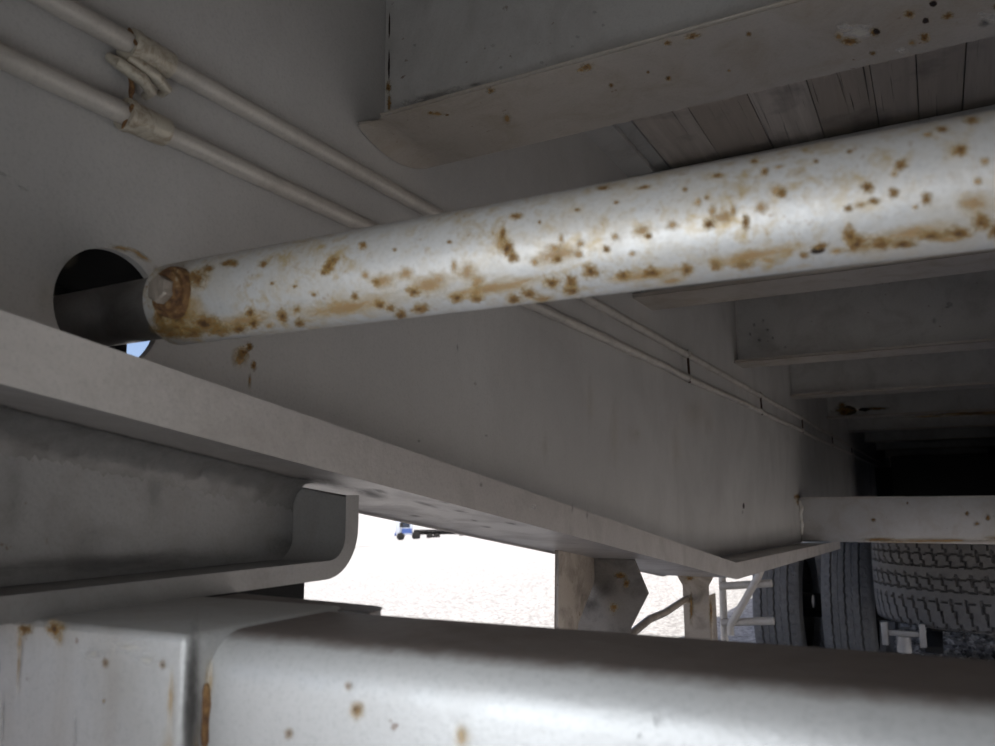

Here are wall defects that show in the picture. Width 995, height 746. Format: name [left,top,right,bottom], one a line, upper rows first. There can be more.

rust [952,145,966,156]
rust [696,196,765,231]
rust [844,182,879,212]
rust [832,198,995,253]
rust [189,259,237,288]
rust [321,255,338,276]
rust [497,228,518,263]
rust [450,236,599,304]
rust [616,263,693,284]
rust [710,248,785,271]
rust [315,269,442,319]
rust [153,298,305,338]